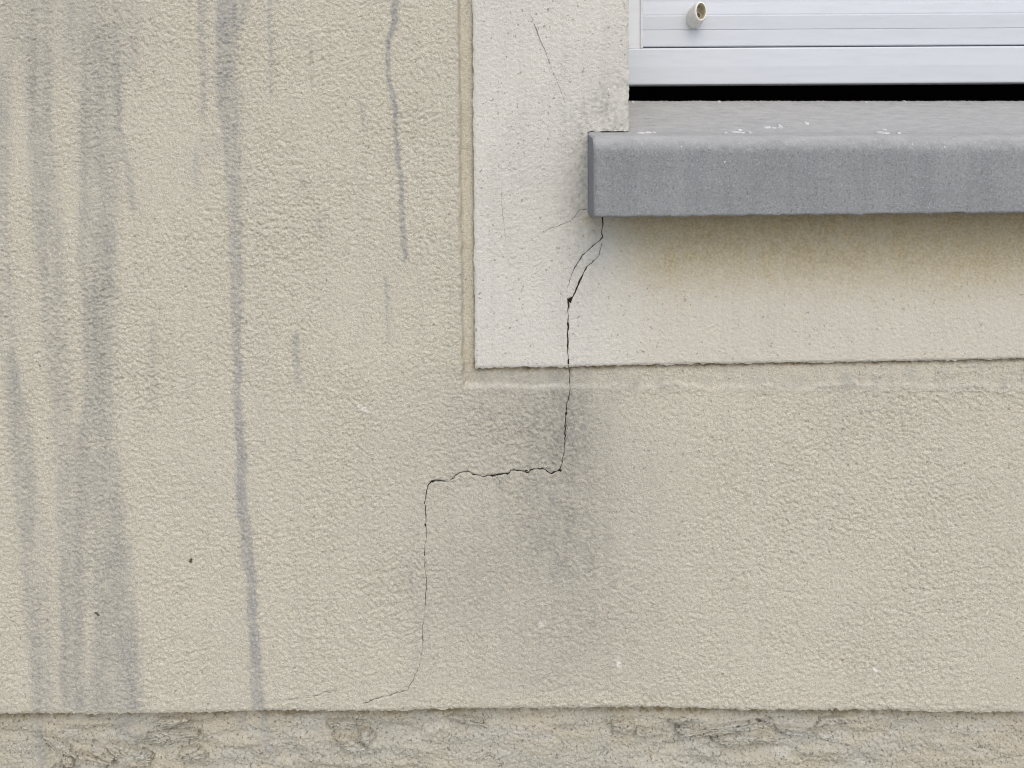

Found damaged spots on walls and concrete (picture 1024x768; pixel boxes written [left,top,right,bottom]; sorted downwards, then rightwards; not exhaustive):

water stain [0,0,162,768]
water stain [190,0,275,711]
water stain [384,0,409,265]
crack [365,209,603,703]